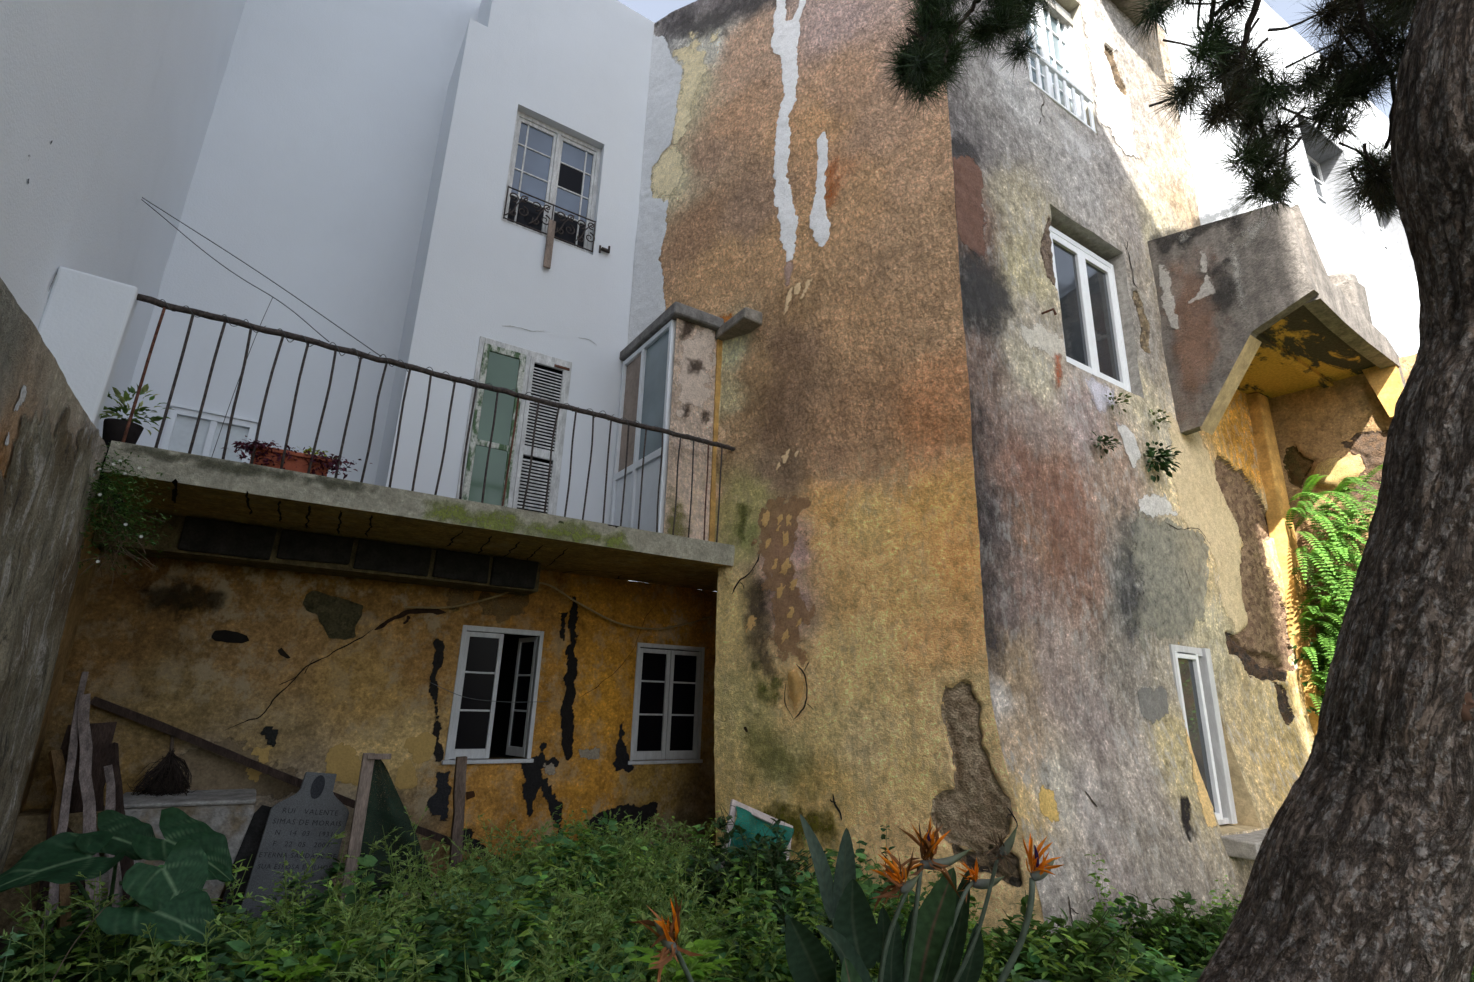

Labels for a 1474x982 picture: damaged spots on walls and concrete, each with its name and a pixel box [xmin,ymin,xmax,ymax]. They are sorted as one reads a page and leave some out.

peeling [651,30,718,197]
peeling [1080,3,1140,158]
peeling [1118,425,1141,468]
peeling [744,495,816,665]
spalling [1139,408,1296,725]
crack [222,629,373,732]
spalling [931,682,1022,887]
peeling [1186,728,1217,828]